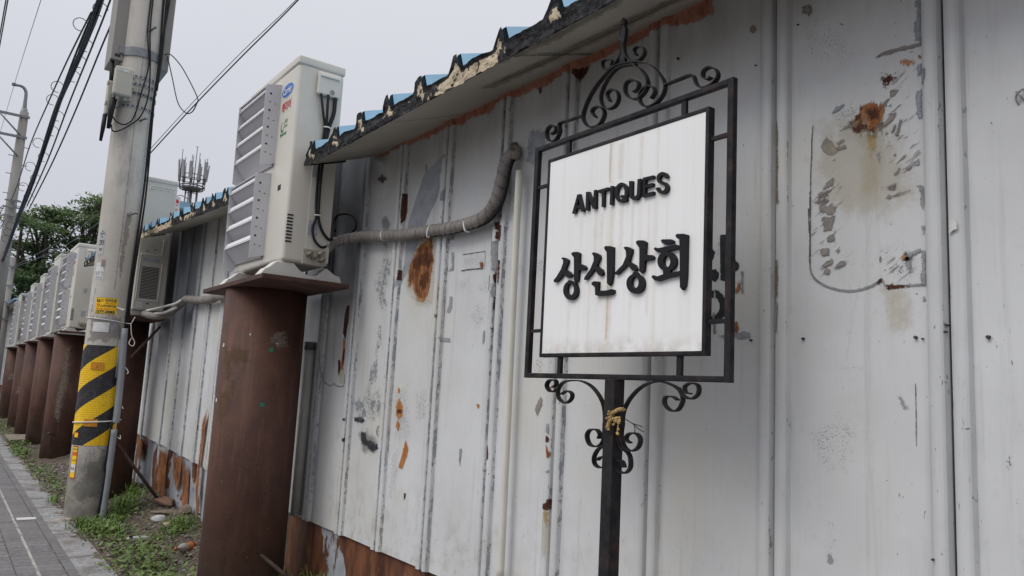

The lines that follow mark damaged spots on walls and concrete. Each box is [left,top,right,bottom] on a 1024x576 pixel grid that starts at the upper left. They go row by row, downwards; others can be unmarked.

rust [377,0,714,157]
peeling [821,104,853,161]
rust [852,102,885,136]
rust [400,193,408,223]
peeling [816,178,846,275]
peeling [877,153,924,210]
rust [396,237,434,306]
peeling [899,249,926,301]
rust [338,305,350,375]
rust [157,410,208,516]
rust [389,388,409,499]